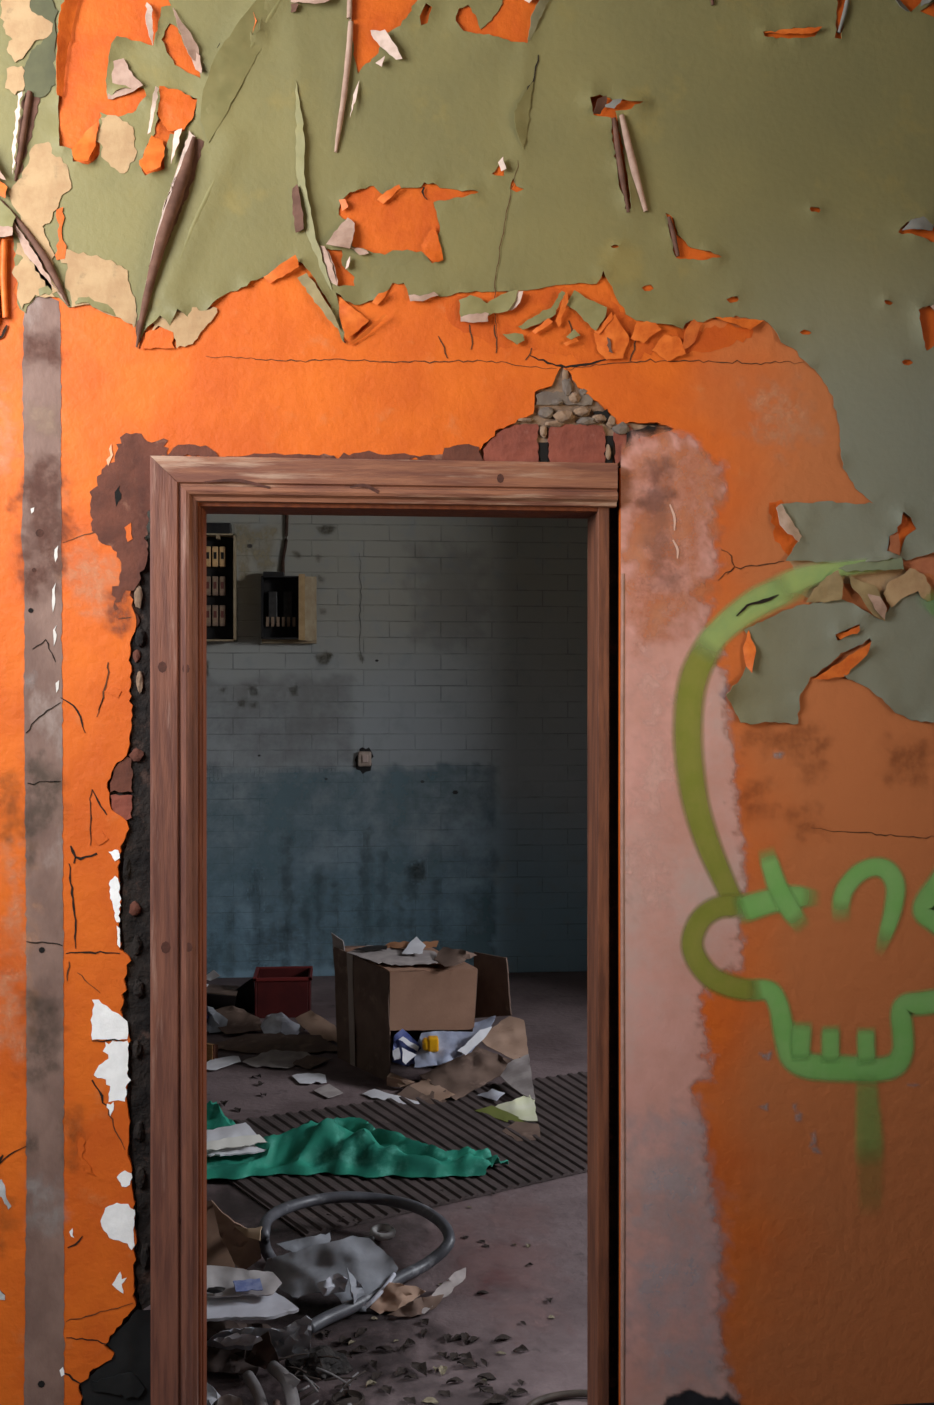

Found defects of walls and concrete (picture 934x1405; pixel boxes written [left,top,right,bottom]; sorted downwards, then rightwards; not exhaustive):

peeling [334,0,432,153]
peeling [456,0,549,43]
peeling [0,0,217,349]
peeling [326,183,475,345]
crack [207,55,801,370]
peeling [591,95,648,212]
crack [26,662,110,733]
crack [718,549,784,616]
peeling [814,625,871,680]
peeling [769,500,934,621]
crack [26,789,120,993]
flaking render [81,285,764,1405]